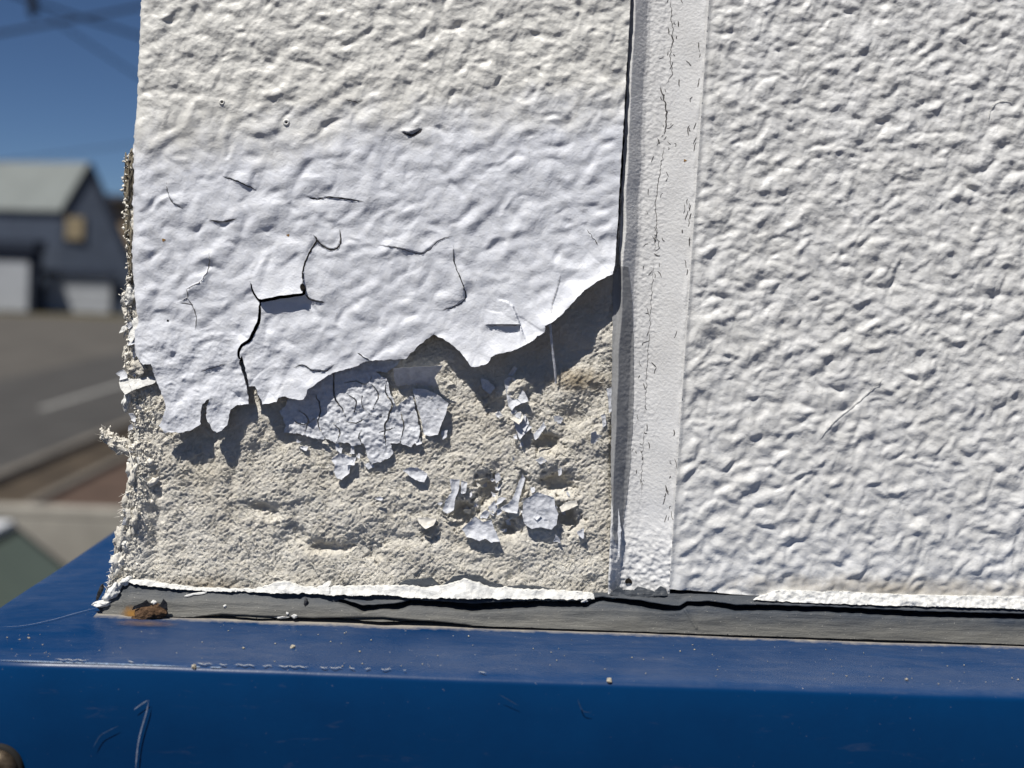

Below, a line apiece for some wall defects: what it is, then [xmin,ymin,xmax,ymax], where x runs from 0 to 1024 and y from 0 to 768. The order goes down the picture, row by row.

crack [180,259,210,328]
crack [201,229,341,372]
crack [381,236,466,310]
peeling [98,148,667,601]